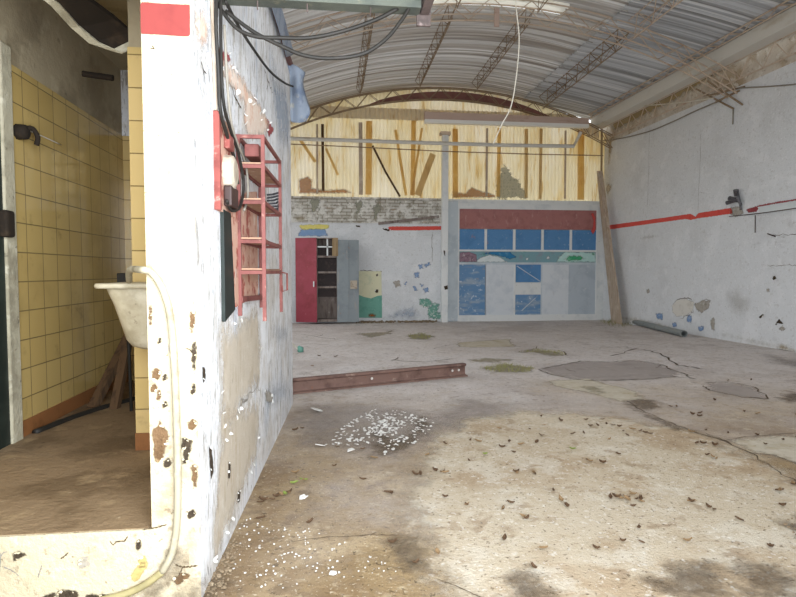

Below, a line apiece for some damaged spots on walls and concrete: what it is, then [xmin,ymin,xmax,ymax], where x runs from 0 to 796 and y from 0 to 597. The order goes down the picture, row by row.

peeling [223,52,274,136]
spalling [687,300,715,331]
spalling [150,368,167,407]
spalling [190,311,207,395]
crack [526,346,595,381]
crack [601,346,769,399]
spalling [152,421,171,468]
spalling [181,419,197,487]
peeling [209,314,262,563]
crack [628,401,796,481]
peeling [127,540,148,582]
spalling [173,573,190,585]